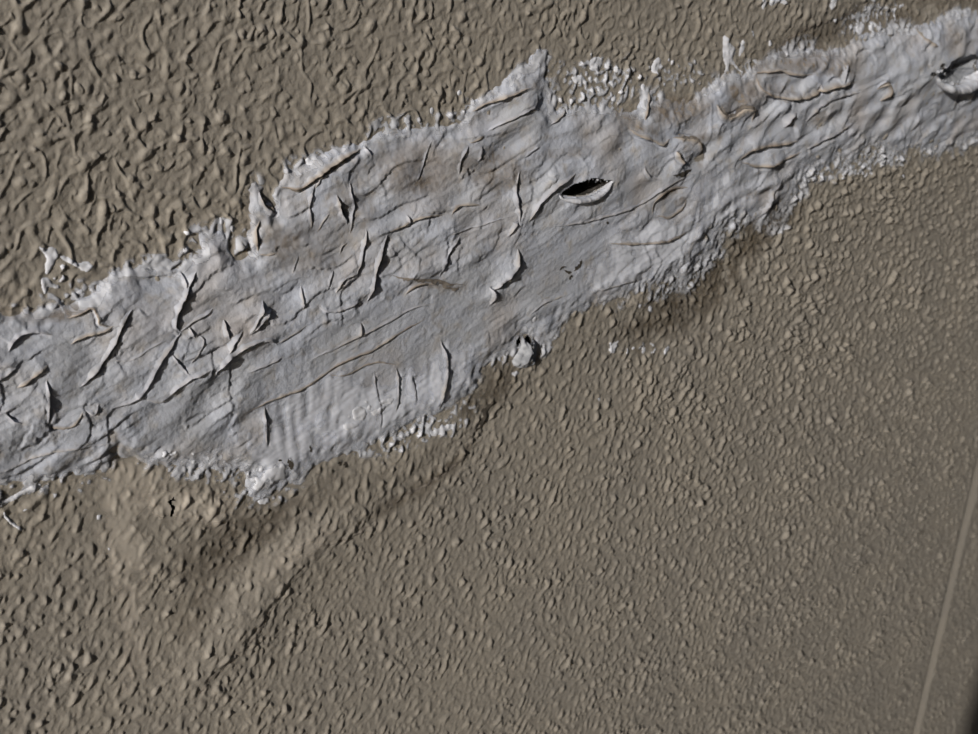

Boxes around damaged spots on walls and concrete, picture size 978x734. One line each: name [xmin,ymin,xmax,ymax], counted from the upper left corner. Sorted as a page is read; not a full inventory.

peeling [723,31,754,74]
peeling [558,53,674,104]
hole [930,54,978,95]
hole [562,178,612,197]
crack [673,169,691,178]
peeling [39,247,93,294]
crack [389,275,463,291]
crack [560,259,582,280]
peeling [609,341,670,355]
peeling [383,416,455,452]
crack [278,446,312,470]
crack [326,401,494,546]